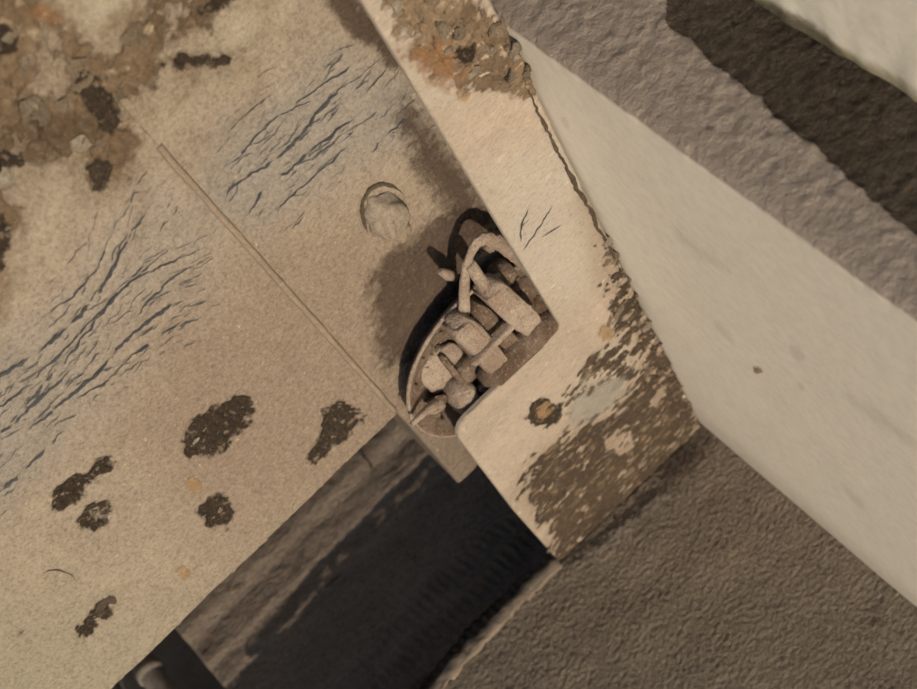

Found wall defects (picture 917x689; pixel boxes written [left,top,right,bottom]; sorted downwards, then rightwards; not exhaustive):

crack [0,170,215,515]
spalling [0,0,231,272]
crack [216,45,414,229]
leakage [370,210,490,368]
peeling [381,0,536,100]
crack [520,208,573,248]
peeling [515,236,699,559]